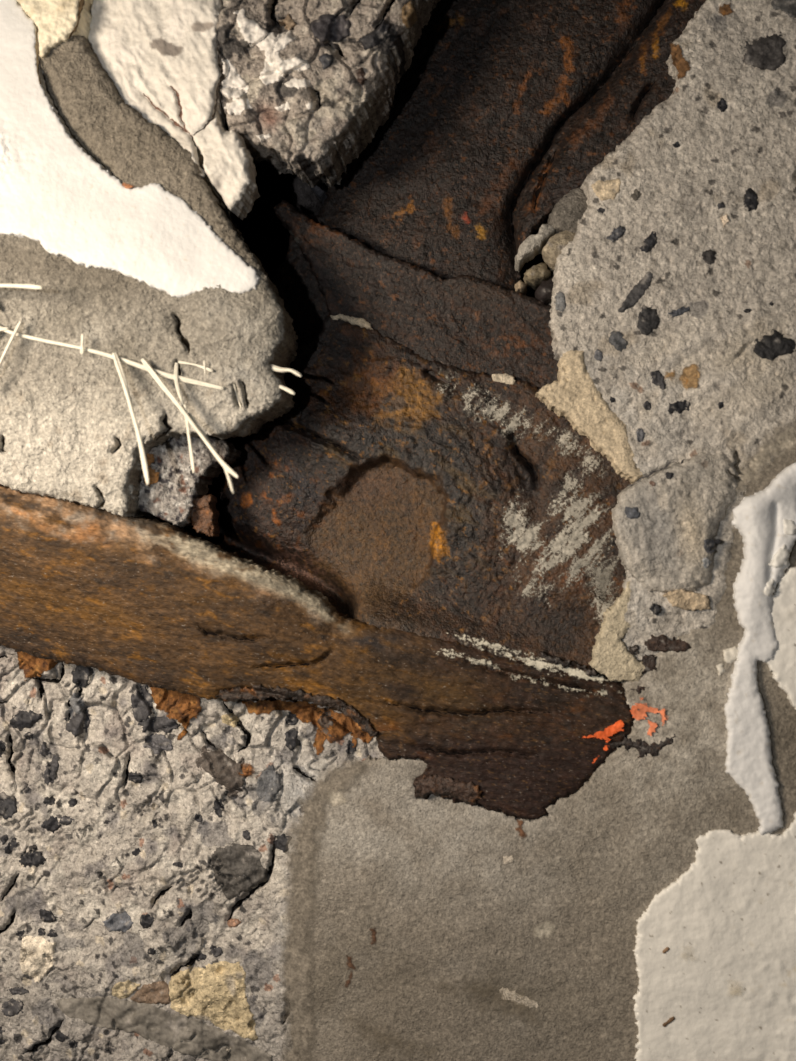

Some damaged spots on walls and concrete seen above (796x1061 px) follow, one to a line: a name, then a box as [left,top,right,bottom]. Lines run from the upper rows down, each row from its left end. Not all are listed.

peeling [0,0,440,298]
rust [142,453,160,487]
spalling [548,0,796,1061]
crack [8,734,16,774]
rust [150,687,202,740]
crack [201,691,252,752]
rust [242,698,373,755]
water stain [330,792,346,806]
crack [0,873,19,934]
spalling [0,646,386,1061]
crack [227,836,276,921]
water stain [533,921,555,938]